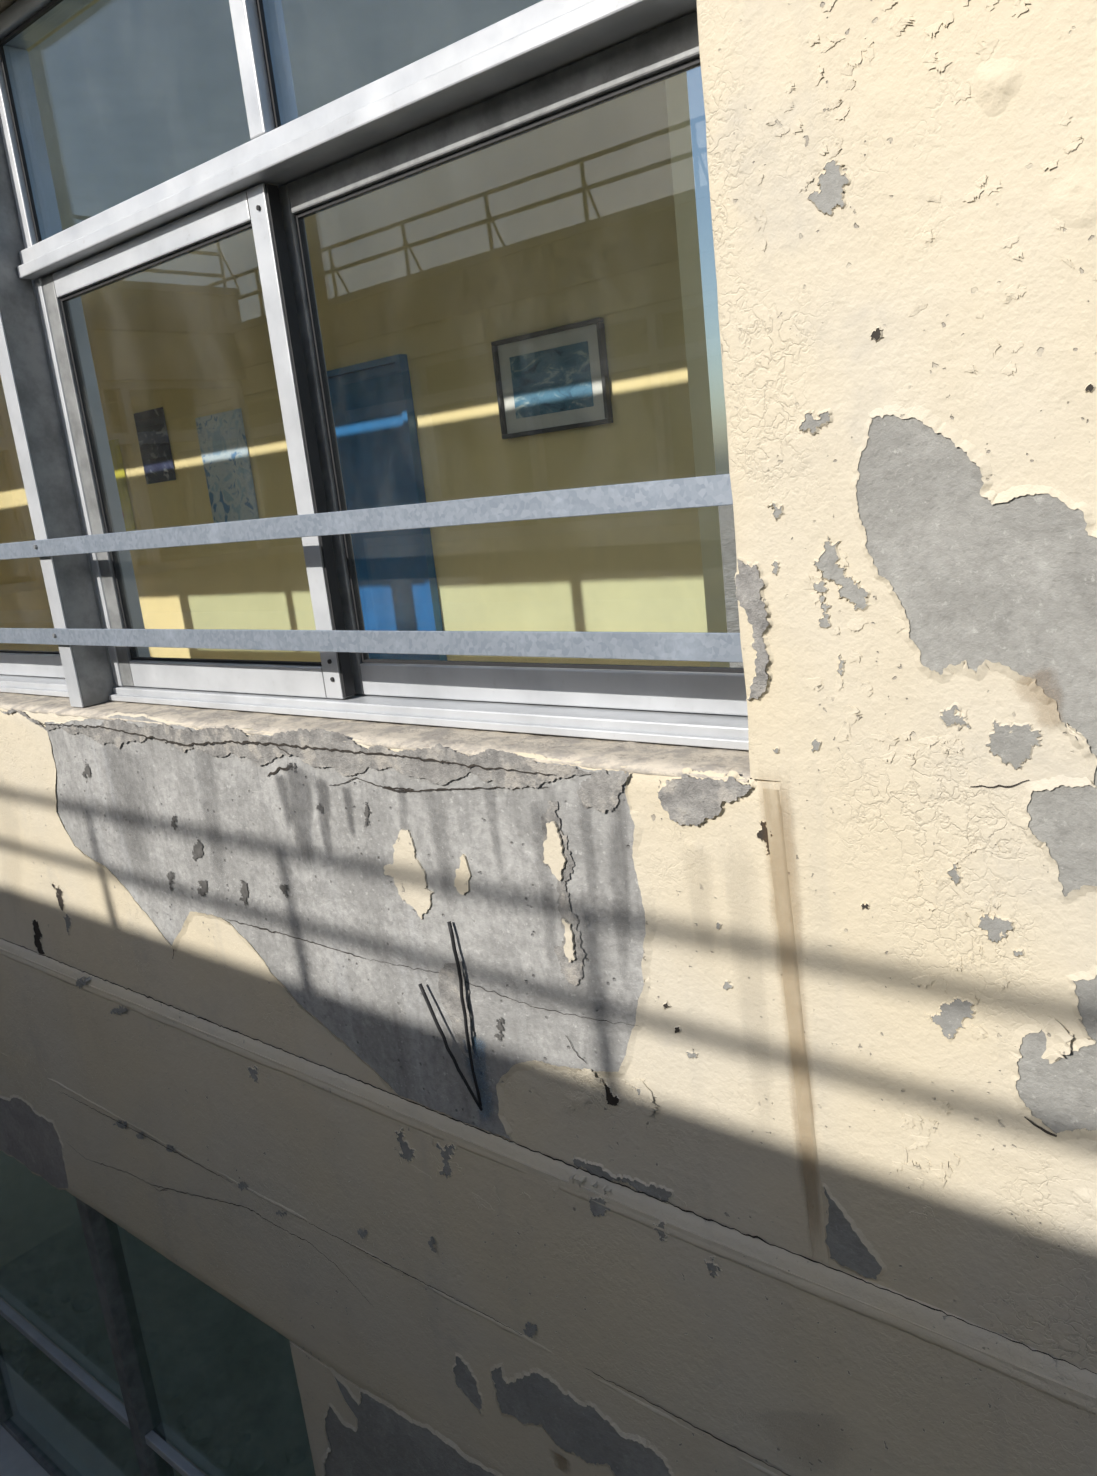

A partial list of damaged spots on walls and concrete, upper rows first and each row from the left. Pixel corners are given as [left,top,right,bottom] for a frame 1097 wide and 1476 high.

peeling [797,31,874,217]
spalling [735,557,780,702]
peeling [798,404,1097,904]
crack [35,723,554,793]
spalling [657,768,757,828]
spalling [0,708,672,1141]
peeling [930,996,976,1039]
peeling [1008,955,1097,1142]
crack [0,919,1097,1374]
peeling [321,1365,503,1476]
peeling [452,1352,675,1476]
crack [586,1368,790,1476]